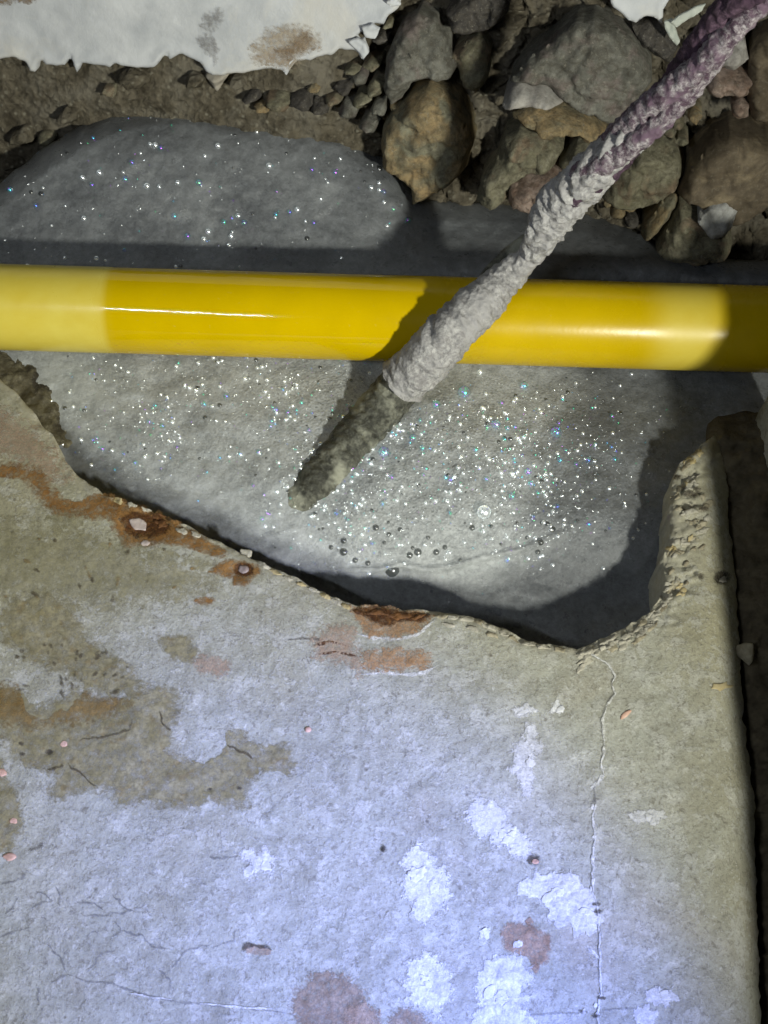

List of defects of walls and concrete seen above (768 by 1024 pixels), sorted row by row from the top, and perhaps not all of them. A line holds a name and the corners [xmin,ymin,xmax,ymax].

corrosion [0,462,128,535]
spalling [112,497,201,548]
corrosion [164,521,260,586]
spalling [259,449,730,679]
water stain [0,516,297,861]
water stain [506,721,546,797]
water stain [461,793,533,861]
crack [537,652,617,1024]
water stain [398,839,454,927]
corrosion [500,917,551,973]
water stain [401,948,456,1021]
water stain [471,953,538,1024]